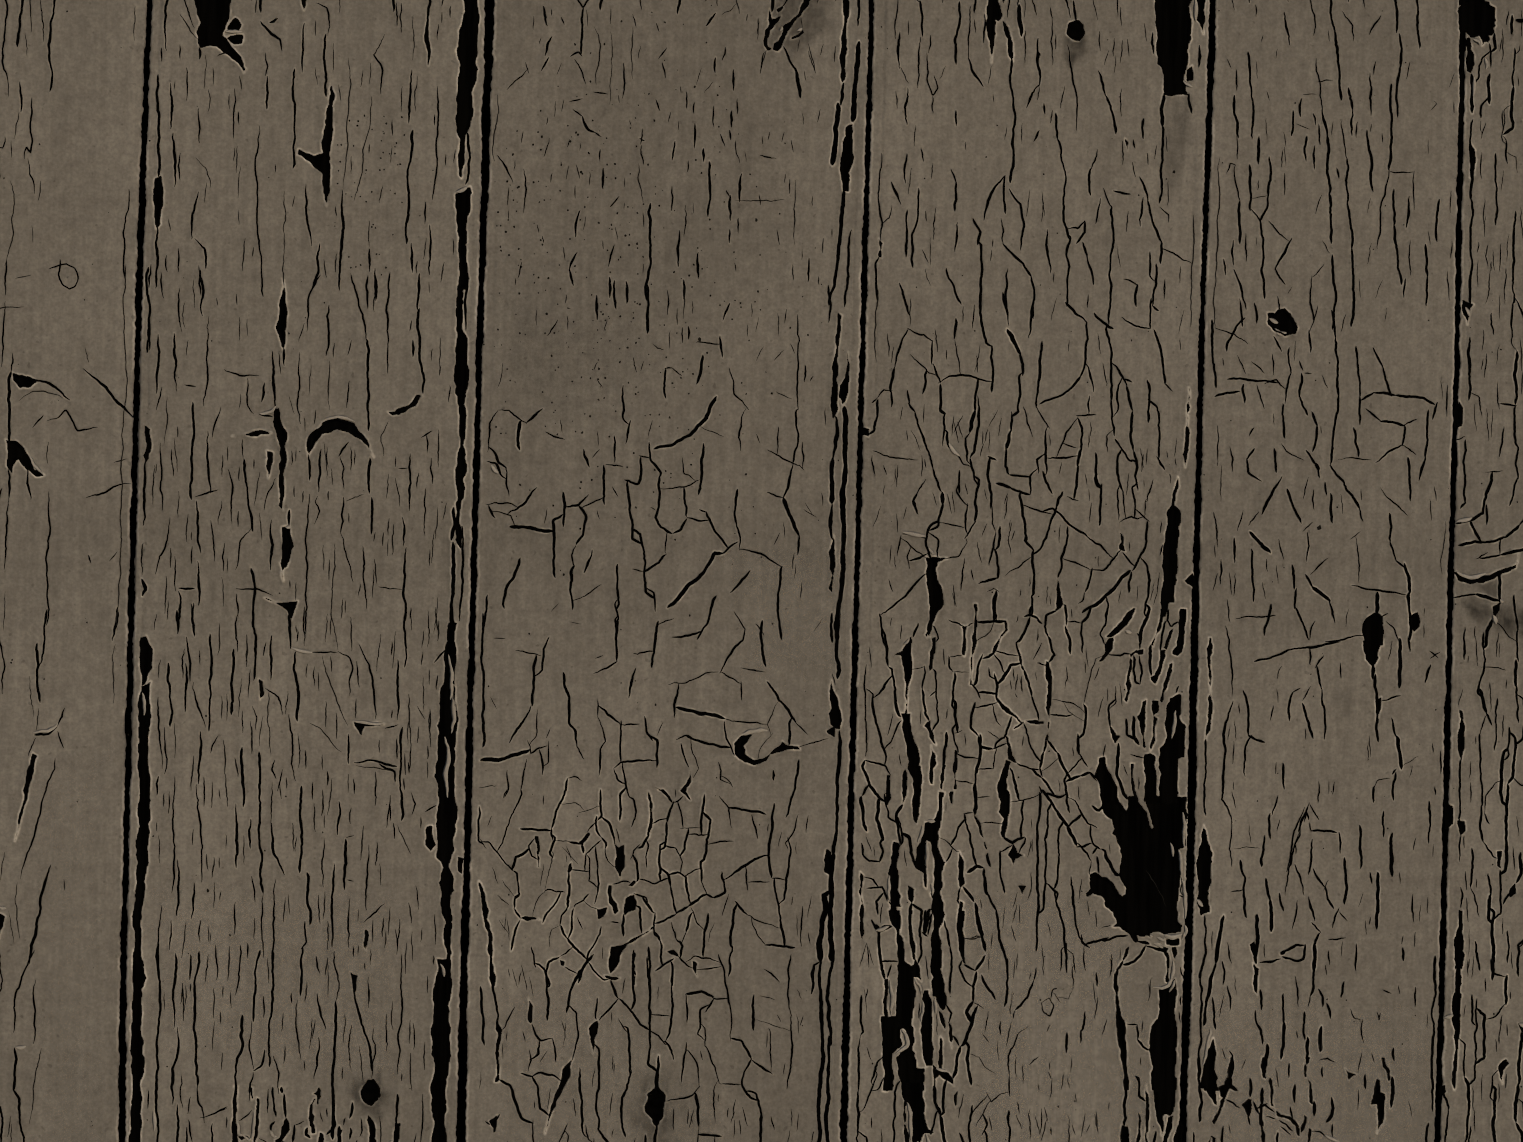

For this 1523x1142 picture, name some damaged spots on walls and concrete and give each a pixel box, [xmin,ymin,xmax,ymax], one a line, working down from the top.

peeling [164,0,245,71]
peeling [1155,0,1205,203]
crack [477,0,1523,1142]
peeling [259,679,283,752]
peeling [322,645,397,735]
peeling [859,390,1274,1142]
peeling [231,1015,400,1142]